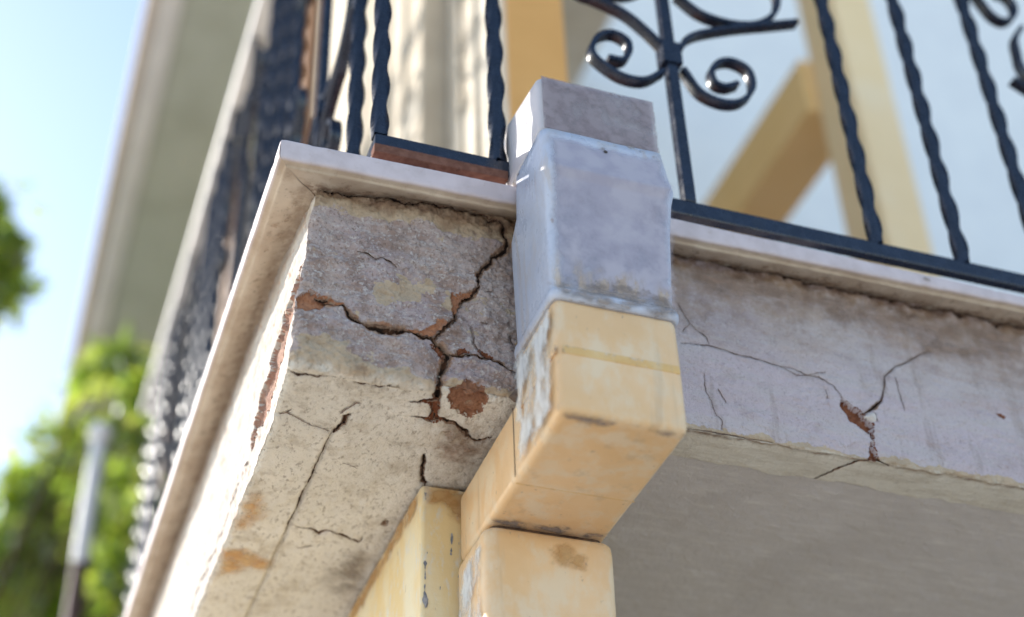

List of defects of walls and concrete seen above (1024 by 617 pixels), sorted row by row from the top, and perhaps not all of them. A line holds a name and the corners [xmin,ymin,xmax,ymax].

spalling [250,264,344,451]
crack [247,191,516,613]
spalling [447,378,489,418]
crack [693,374,773,443]
crack [678,304,842,399]
spalling [840,397,880,462]
crack [860,351,931,421]
crack [815,459,888,479]